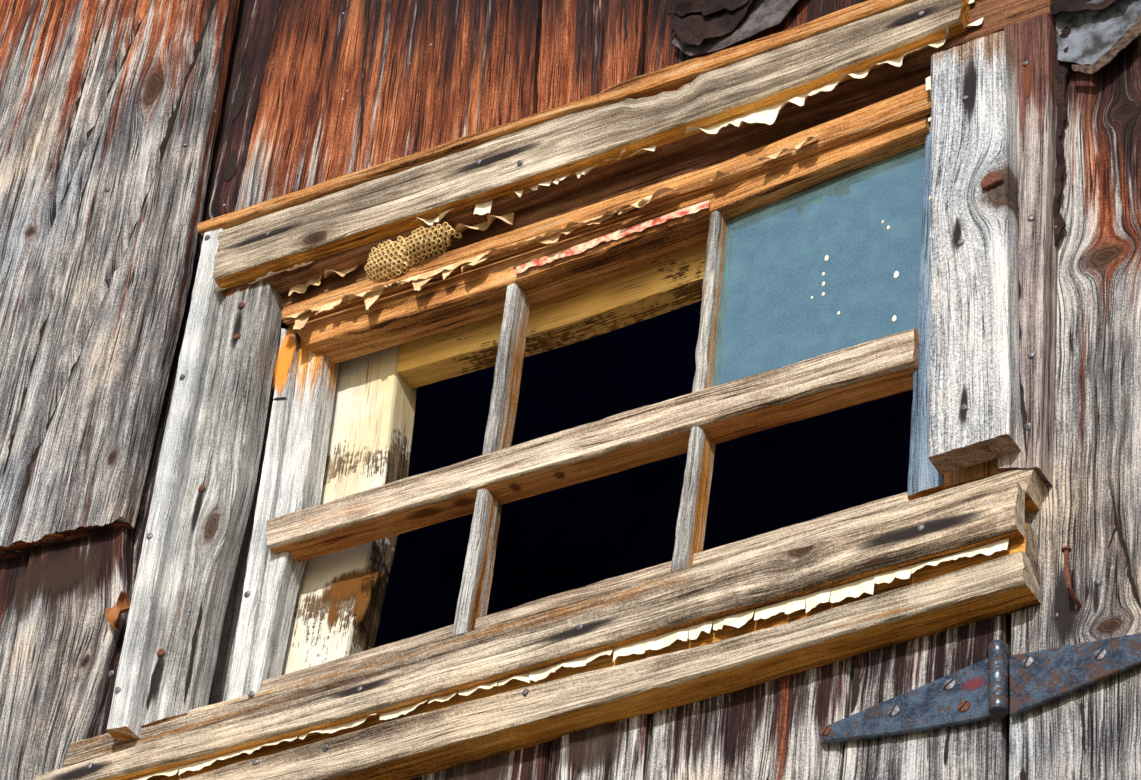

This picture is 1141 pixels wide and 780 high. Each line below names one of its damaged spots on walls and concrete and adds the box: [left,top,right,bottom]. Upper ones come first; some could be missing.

peeling [685,26,949,134]
peeling [514,145,657,197]
peeling [758,134,819,160]
peeling [248,261,313,284]
peeling [280,188,710,330]
peeling [132,538,1009,780]